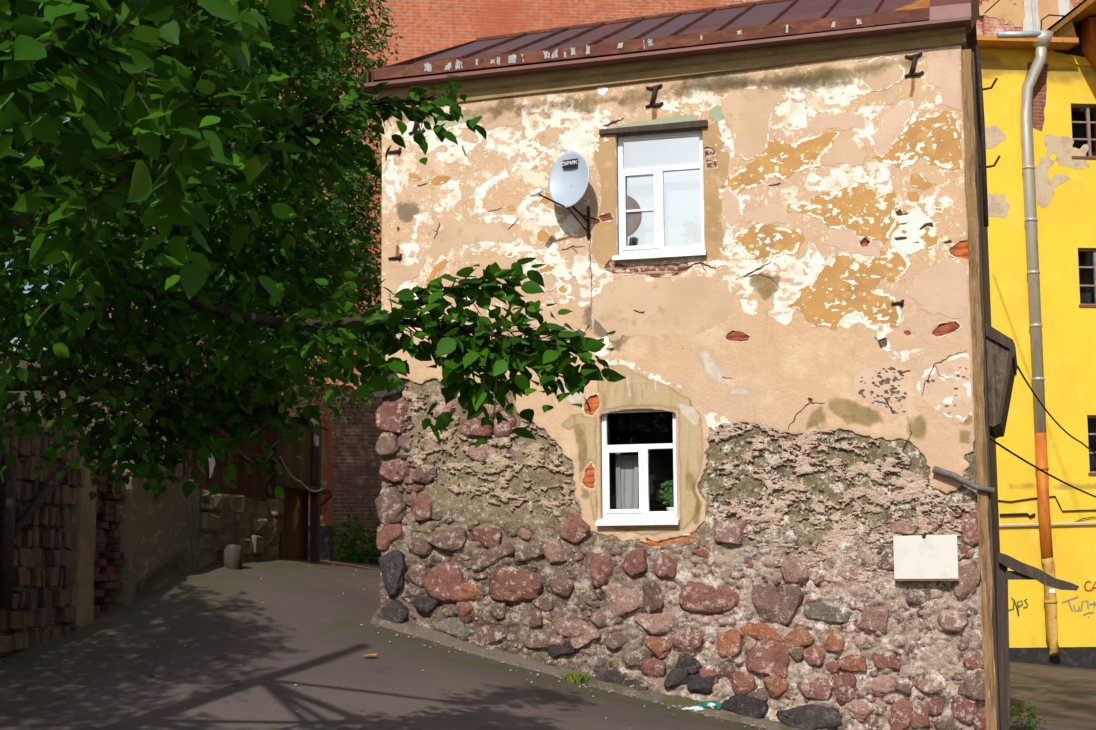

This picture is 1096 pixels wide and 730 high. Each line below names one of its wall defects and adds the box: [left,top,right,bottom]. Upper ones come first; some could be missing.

peeling [979,0,1083,31]
damp [398,203,418,222]
peeling [382,87,689,307]
peeling [658,77,972,423]
peeling [1025,62,1090,208]
crack [884,398,913,451]
crack [898,350,967,395]
spalling [371,373,986,730]